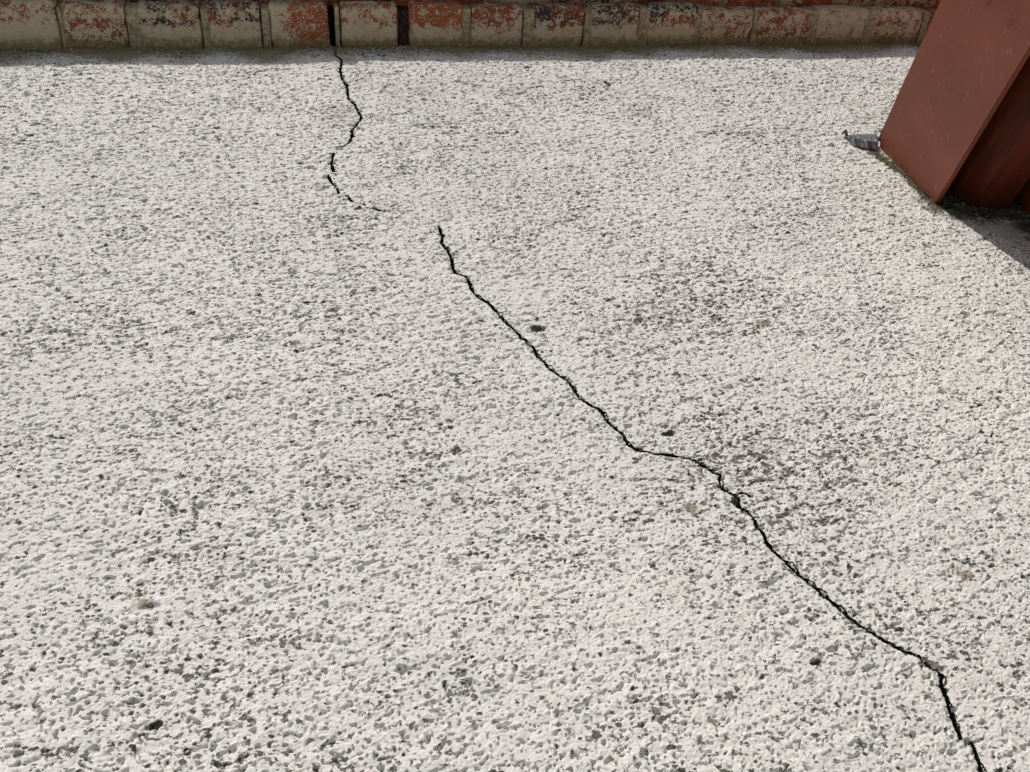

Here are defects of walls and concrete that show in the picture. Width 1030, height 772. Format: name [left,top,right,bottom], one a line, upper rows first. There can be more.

crack [327,6,987,772]